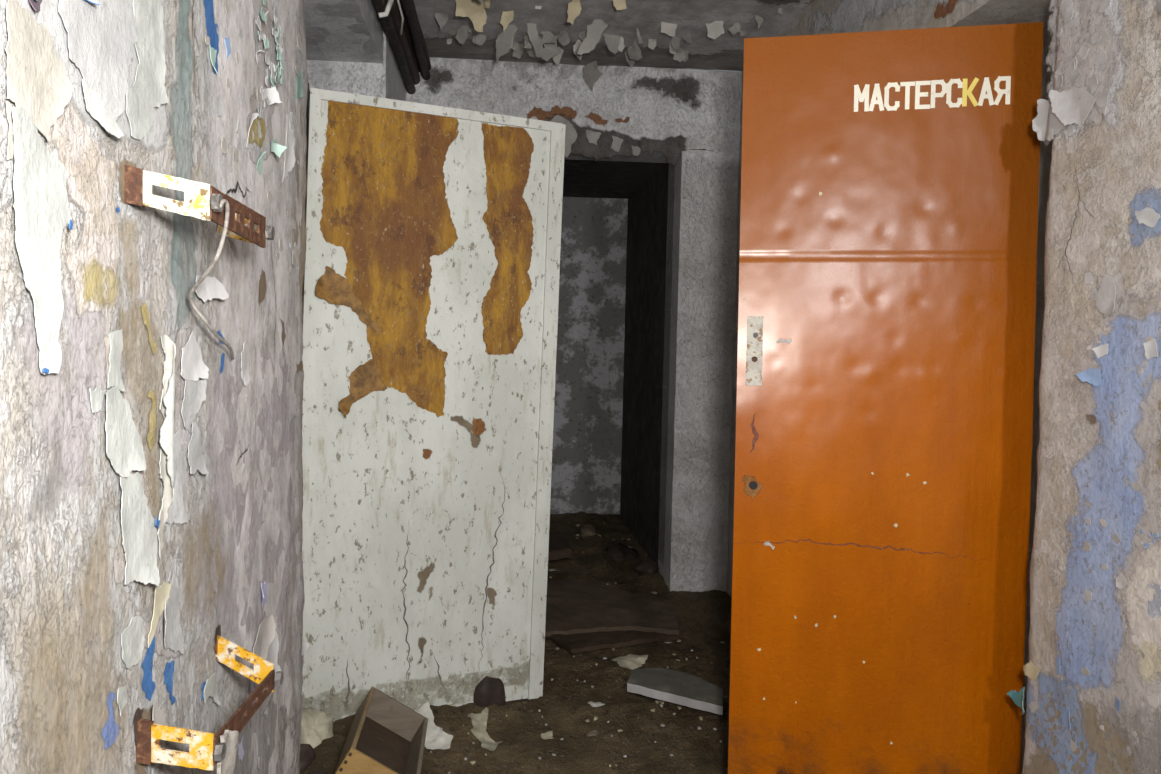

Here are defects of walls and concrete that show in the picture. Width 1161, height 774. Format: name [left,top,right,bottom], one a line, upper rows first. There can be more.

peeling [414,0,976,91]
peeling [1032,0,1126,145]
peeling [527,105,686,165]
peeling [1130,189,1161,246]
peeling [0,0,309,774]